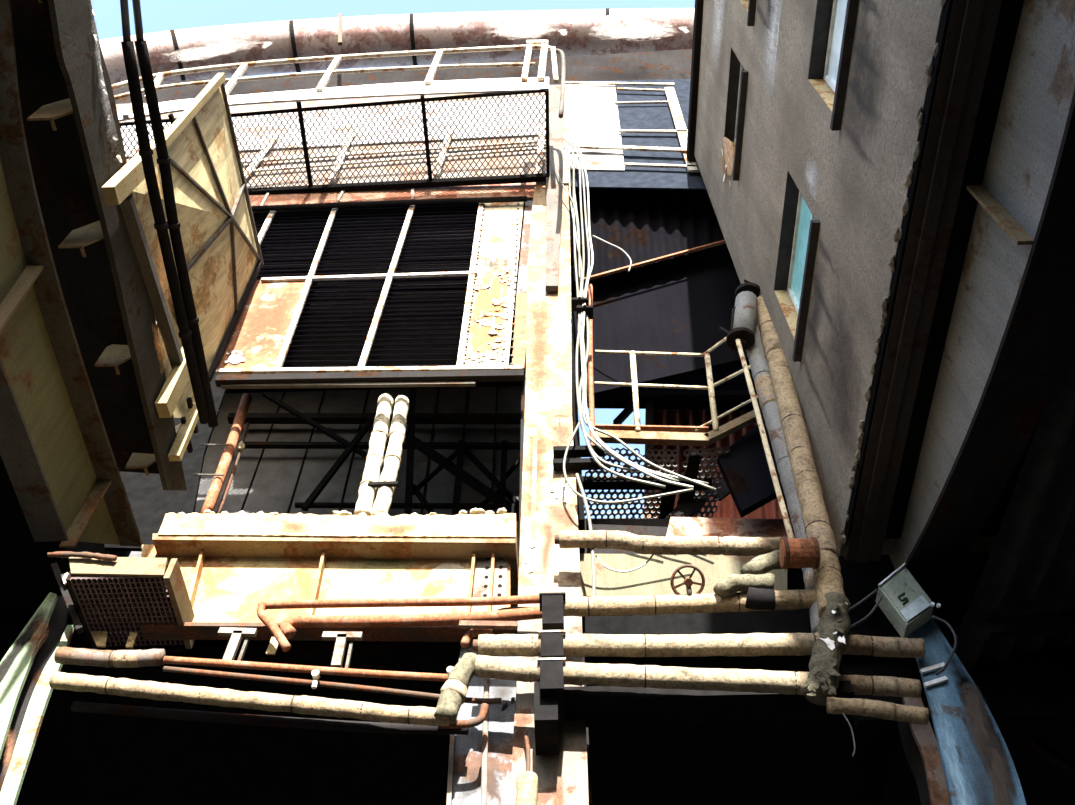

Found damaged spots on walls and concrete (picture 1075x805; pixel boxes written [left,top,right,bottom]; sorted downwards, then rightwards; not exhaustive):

peeling [464,265,513,365]
rust [534,313,546,382]
rust [530,442,542,494]
rust [543,506,572,567]
rust [32,623,47,649]
rust [962,684,1014,805]
rust [554,782,562,805]